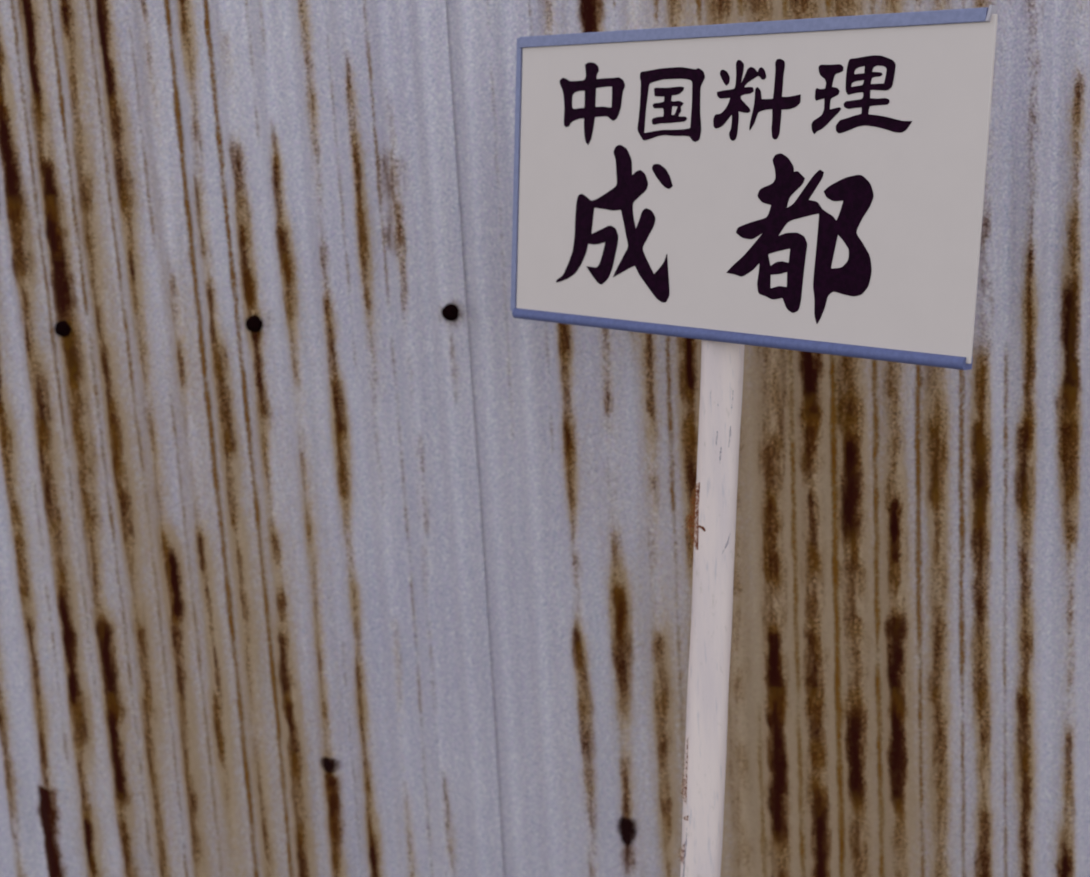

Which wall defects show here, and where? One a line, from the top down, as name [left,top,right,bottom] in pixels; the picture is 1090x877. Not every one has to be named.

rust [578,0,616,33]
rust [0,0,231,877]
rust [316,219,354,568]
rust [546,323,579,578]
rust [1055,75,1084,553]
rust [320,588,381,877]
rust [572,623,597,873]
rust [610,530,637,874]
rust [1055,731,1075,877]